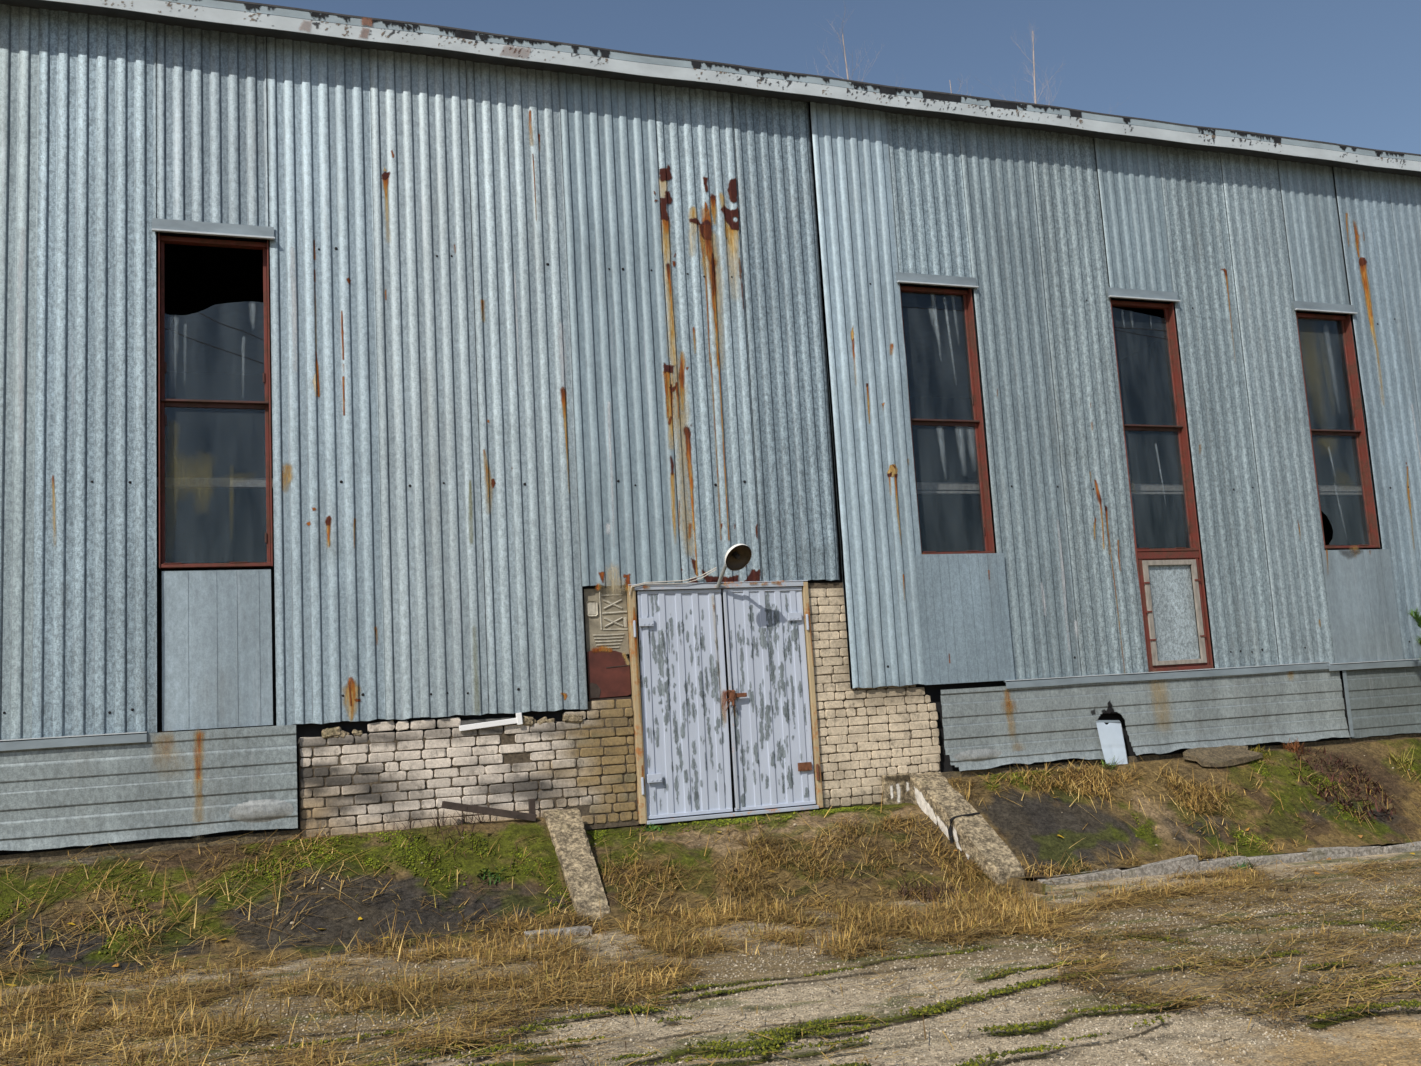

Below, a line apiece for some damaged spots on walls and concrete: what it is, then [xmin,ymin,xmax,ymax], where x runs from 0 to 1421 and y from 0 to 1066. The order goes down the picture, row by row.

peeling [369,20,422,39]
peeling [438,27,610,64]
peeling [691,61,830,94]
peeling [847,82,1083,128]
peeling [1197,127,1282,152]
corrosion [382,150,394,232]
corrosion [1346,213,1382,387]
corrosion [654,165,744,575]
corrosion [561,387,570,491]
corrosion [887,459,908,536]
corrosion [1090,472,1125,673]
peeling [640,558,809,811]